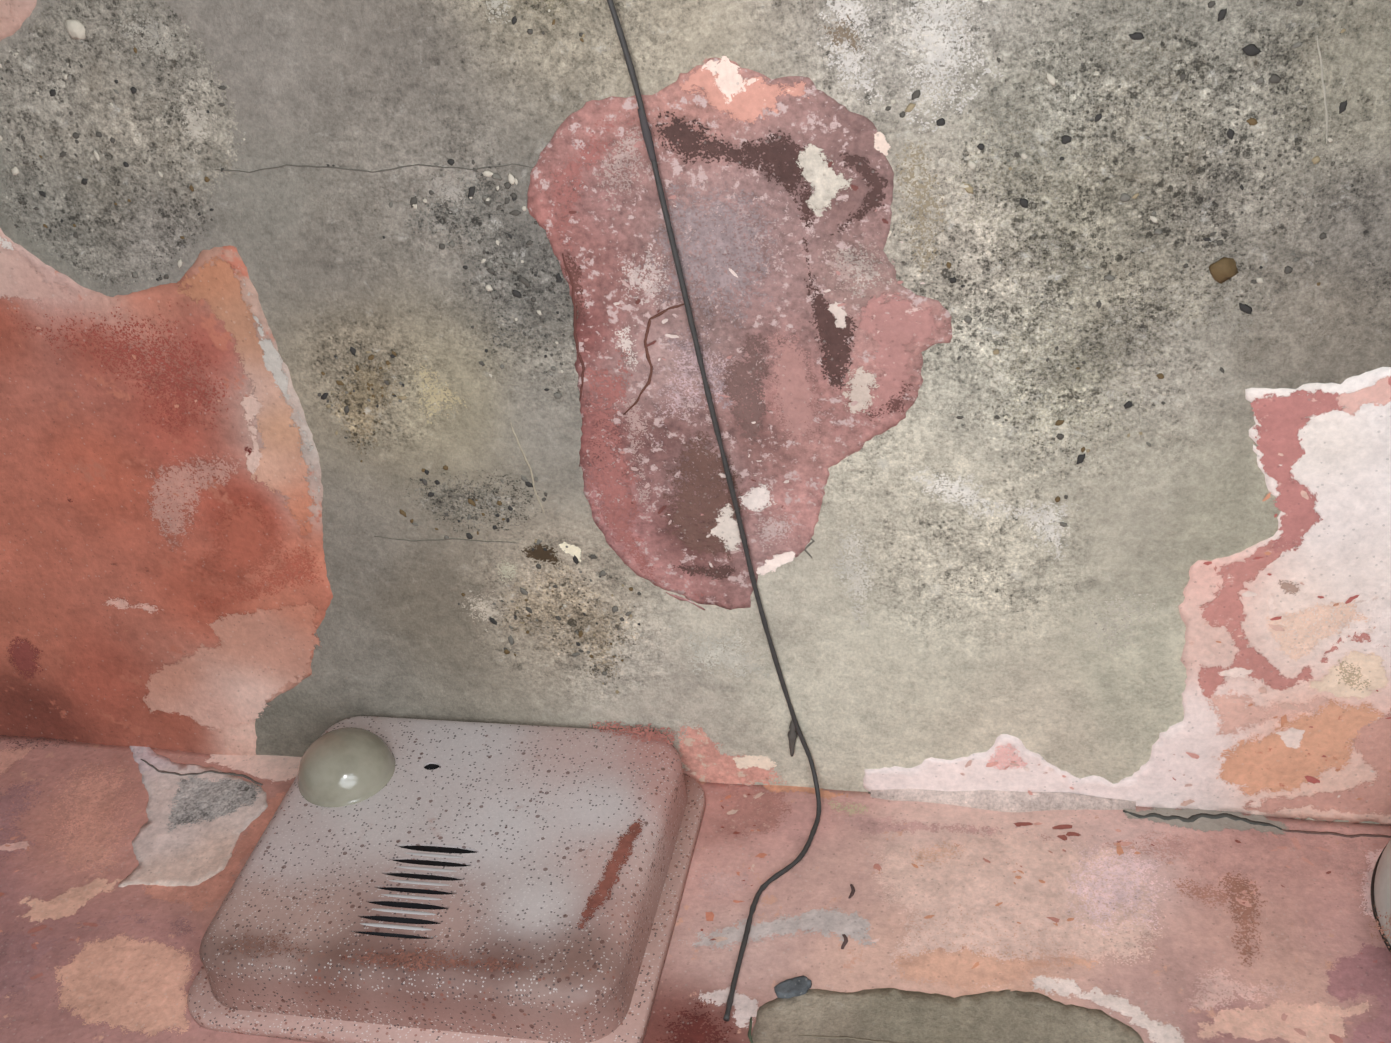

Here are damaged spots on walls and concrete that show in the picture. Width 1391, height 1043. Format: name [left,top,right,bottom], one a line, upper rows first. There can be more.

crack [215,164,534,173]
spalling [318,347,408,462]
peeling [389,0,1347,694]
peeling [0,0,333,926]
peeling [678,367,1391,951]
crack [1123,807,1391,838]
spalling [696,943,1391,1043]